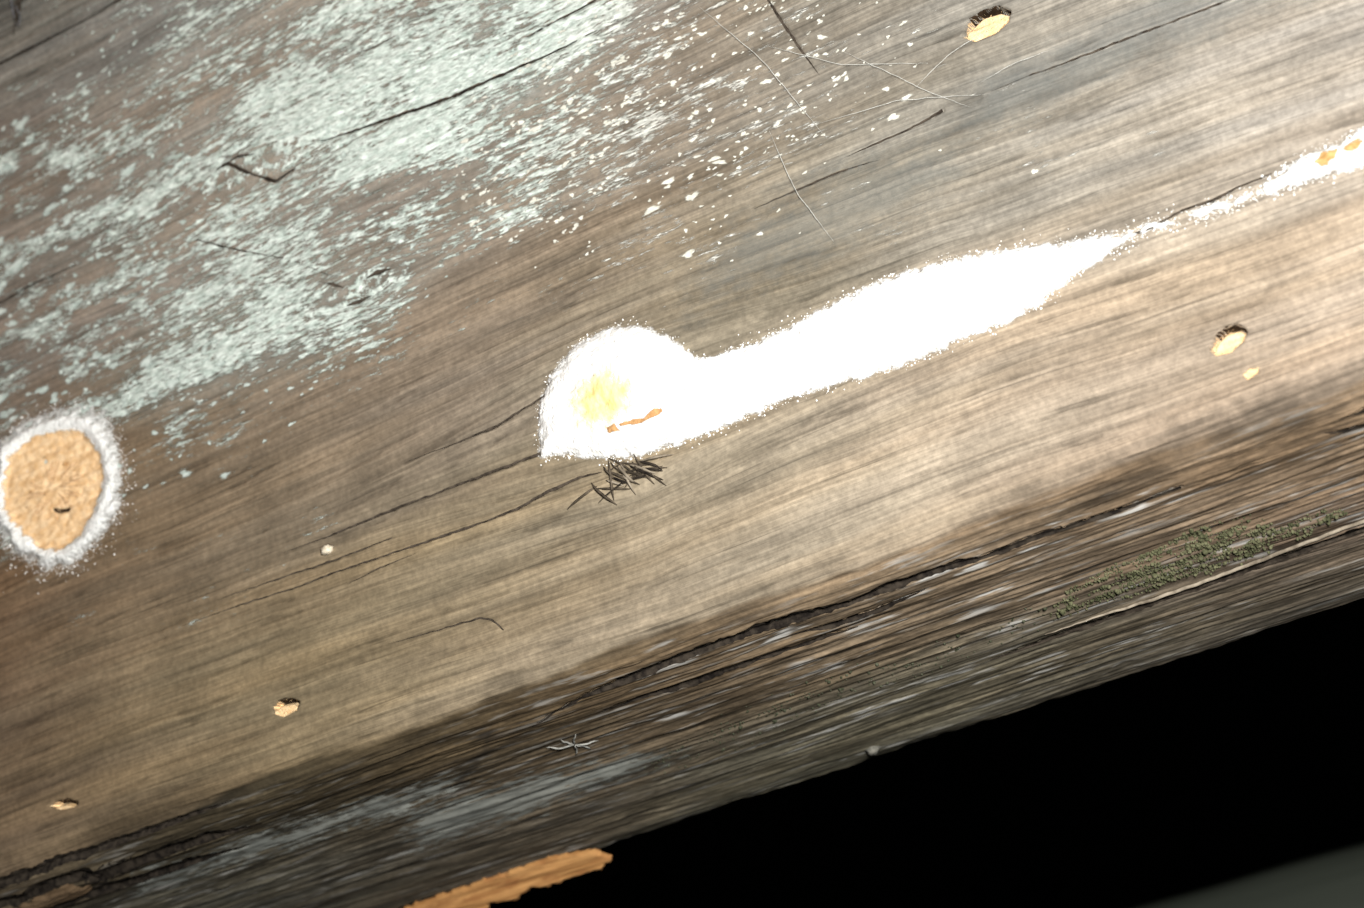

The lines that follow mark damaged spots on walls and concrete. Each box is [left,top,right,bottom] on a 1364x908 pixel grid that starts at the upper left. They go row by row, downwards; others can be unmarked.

crack [217,0,618,182]
crack [767,0,818,73]
damp [534,127,1364,466]
damp [0,400,136,594]
crack [1325,409,1364,434]
crack [0,801,262,908]